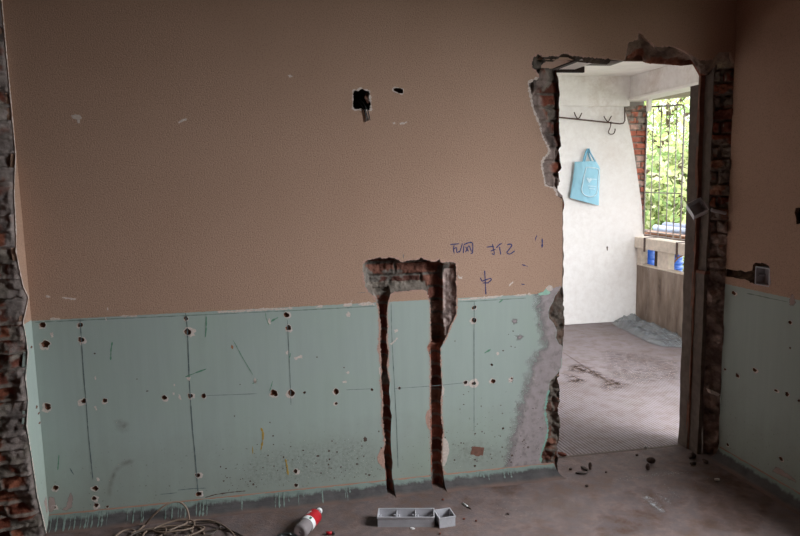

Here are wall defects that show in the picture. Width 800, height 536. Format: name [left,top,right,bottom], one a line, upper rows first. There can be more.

spalling [352,87,372,111]
peeling [218,307,293,332]
spalling [343,256,503,483]
peeling [506,282,565,469]
spalling [625,33,737,455]